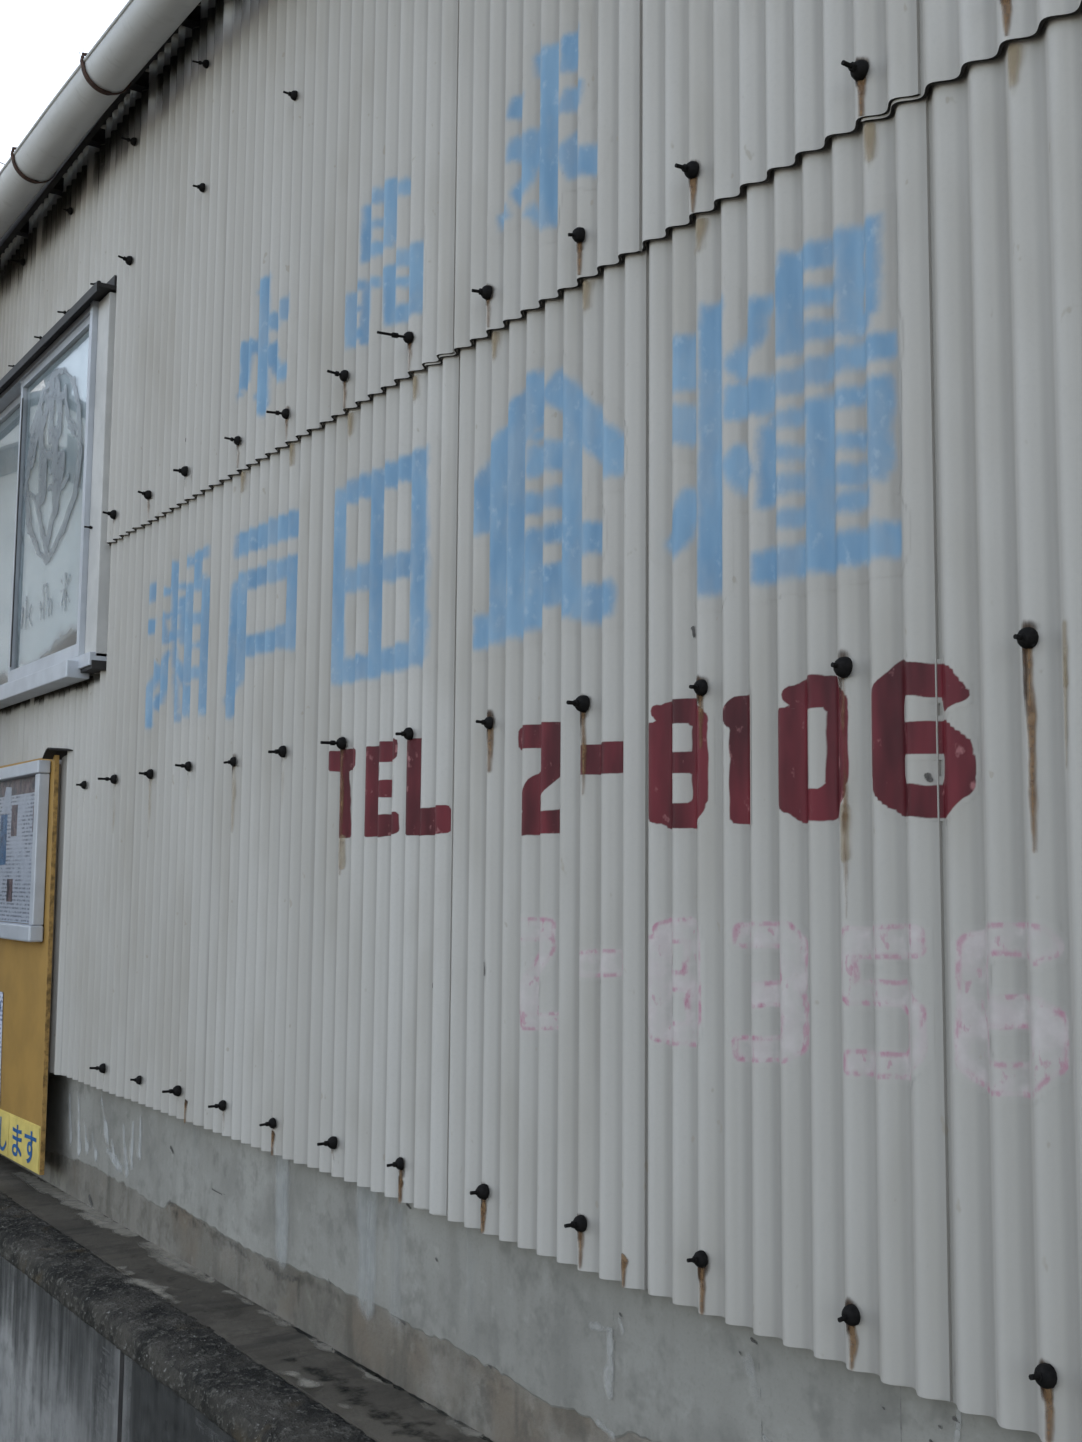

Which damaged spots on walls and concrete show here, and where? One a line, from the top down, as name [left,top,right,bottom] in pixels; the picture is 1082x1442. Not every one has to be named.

rust [1000,0,1011,36]
rust [855,58,869,118]
rust [689,161,697,212]
rust [1022,648,1036,843]
damp [15,1172,249,1302]
rust [698,1266,708,1314]
damp [0,1255,106,1387]
rust [846,1324,857,1369]
rust [1041,1387,1053,1442]